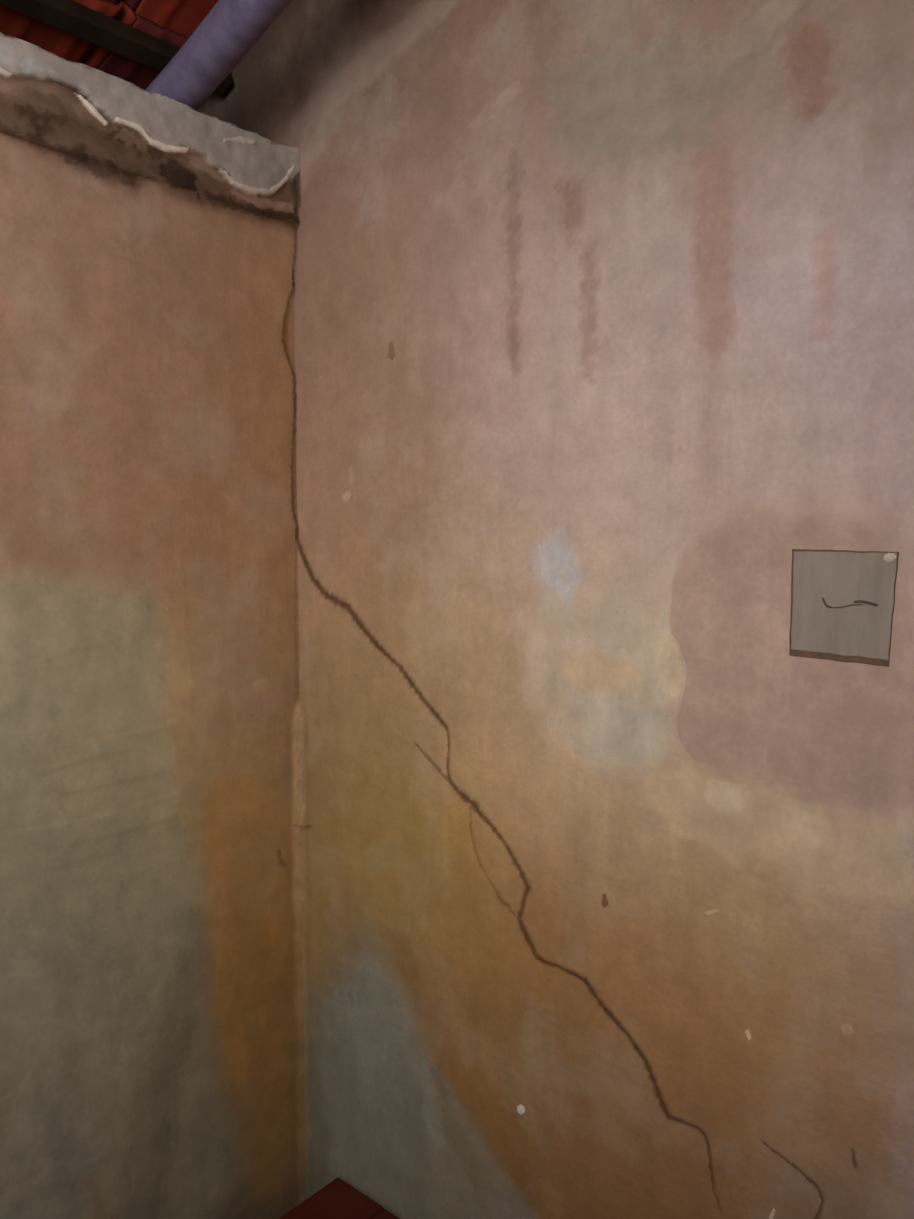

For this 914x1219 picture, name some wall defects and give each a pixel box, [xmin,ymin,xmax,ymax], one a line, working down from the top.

peeling [0,35,301,224]
crack [282,190,719,1206]
crack [762,1140,823,1219]